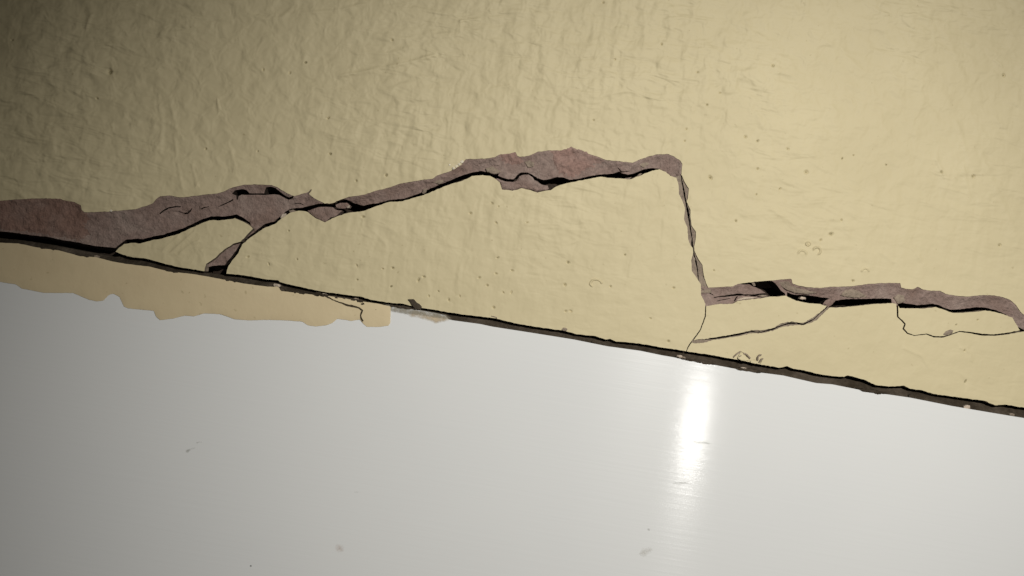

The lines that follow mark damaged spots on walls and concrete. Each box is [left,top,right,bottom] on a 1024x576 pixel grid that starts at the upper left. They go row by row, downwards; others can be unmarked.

peeling [0,147,682,327]
crack [0,238,1024,418]
crack [675,176,712,293]
spalling [693,279,1024,341]